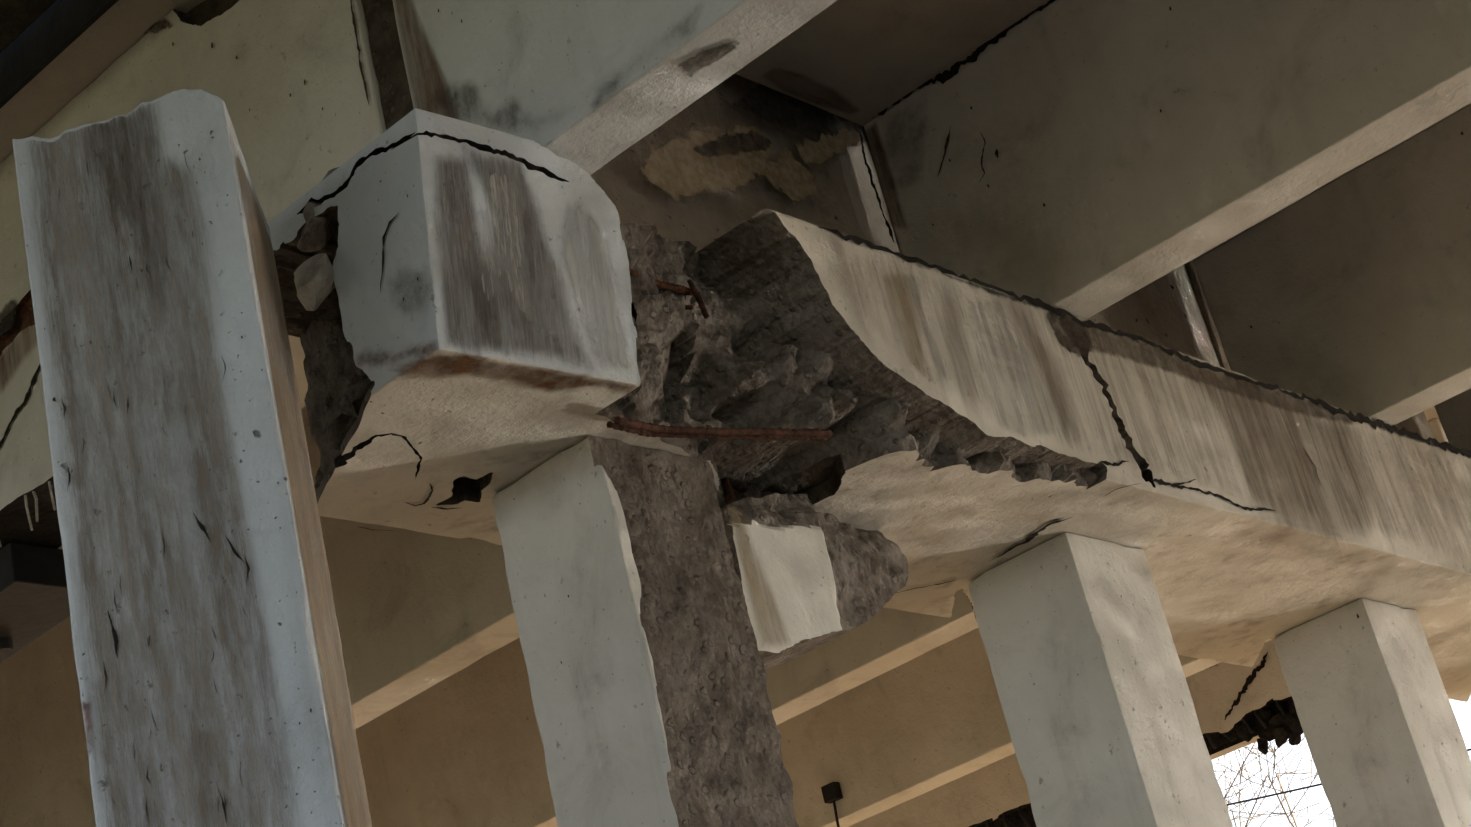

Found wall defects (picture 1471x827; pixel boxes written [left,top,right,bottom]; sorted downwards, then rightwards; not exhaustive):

crack [859,0,1055,243]
crack [297,130,569,214]
rust [0,301,17,336]
peeling [294,253,335,311]
crack [0,364,41,448]
crack [1081,349,1276,511]
damp [237,157,373,827]
crack [334,433,457,531]
spalling [589,208,1107,827]
crack [992,516,1074,560]
crack [1225,652,1268,720]
spalling [1202,696,1304,755]